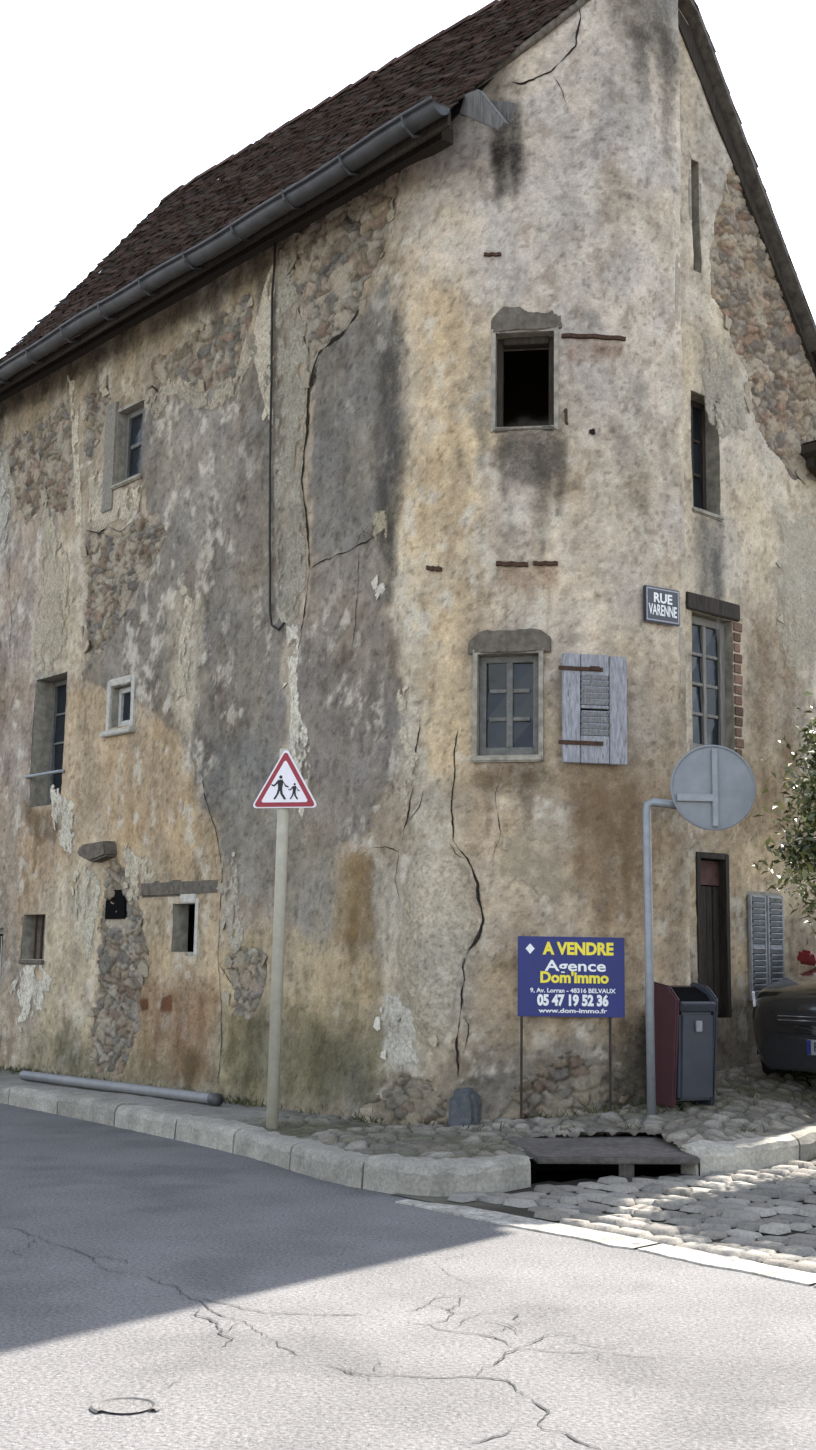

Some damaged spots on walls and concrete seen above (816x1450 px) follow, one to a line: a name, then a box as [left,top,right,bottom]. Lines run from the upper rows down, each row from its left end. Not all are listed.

water stain [492,112,520,173]
crack [514,9,581,109]
spalling [0,375,167,677]
crack [289,263,375,656]
spalling [702,168,816,485]
spalling [50,785,157,1075]
spalling [216,852,267,1021]
crack [361,726,503,1075]